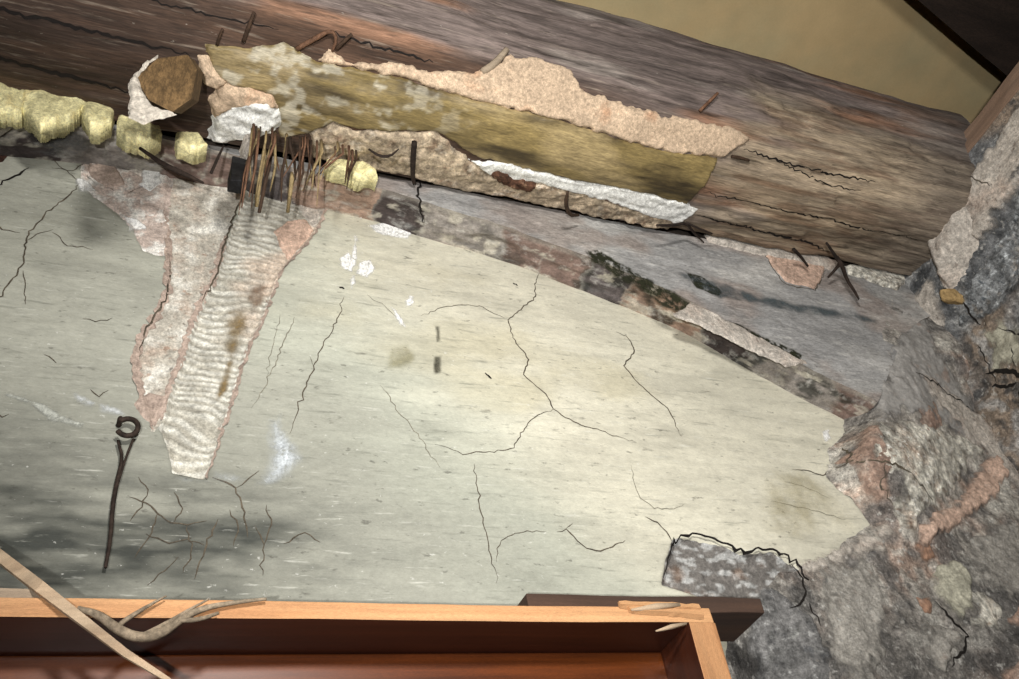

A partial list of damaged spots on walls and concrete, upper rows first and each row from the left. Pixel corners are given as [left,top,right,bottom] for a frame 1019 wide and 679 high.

crack [747,149,875,191]
crack [0,161,93,304]
leakage [6,394,83,426]
flaking render [80,163,328,480]
leakage [268,428,294,480]
crack [290,274,629,580]
leakage [588,250,690,311]
leakage [688,273,841,315]
leakage [732,322,801,359]
flaking render [662,105,1019,679]
crack [963,302,1019,395]
crack [130,471,320,585]